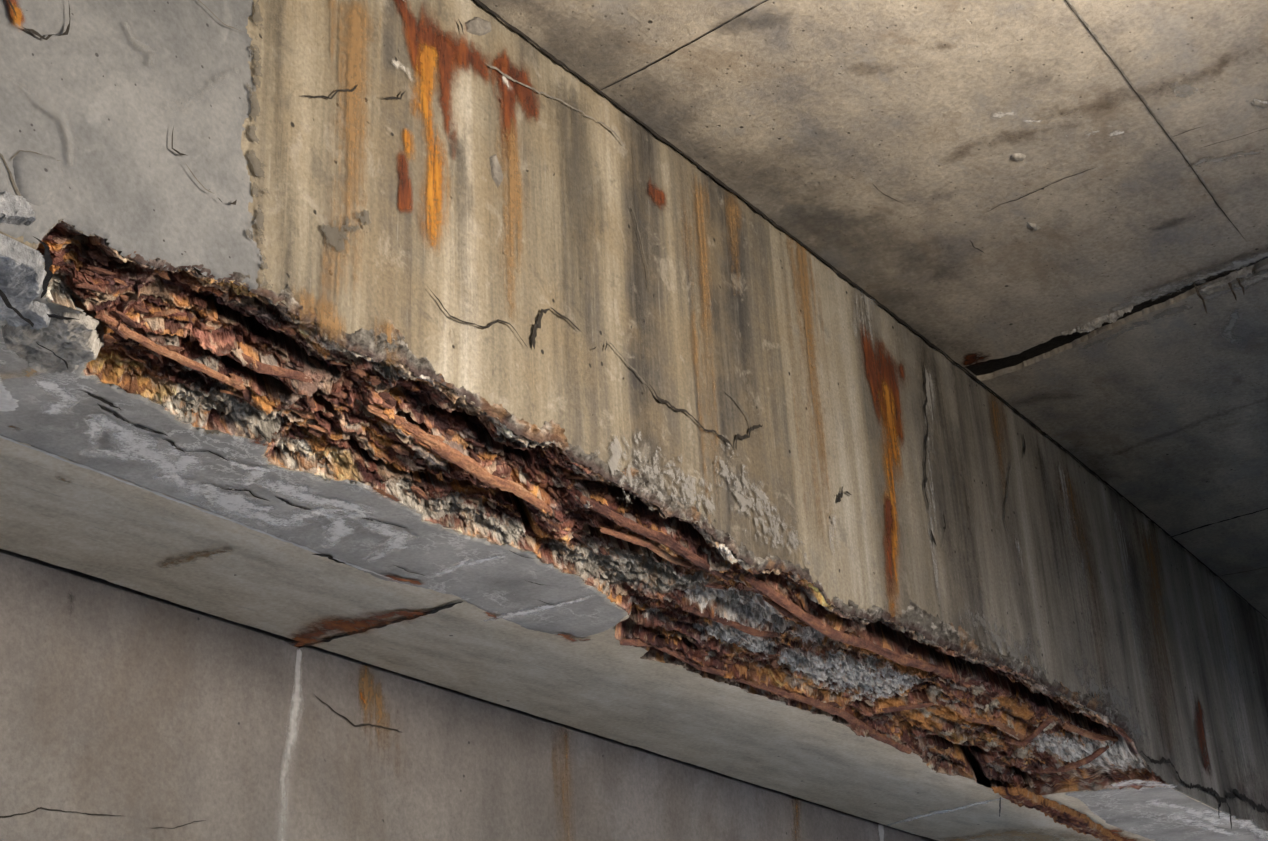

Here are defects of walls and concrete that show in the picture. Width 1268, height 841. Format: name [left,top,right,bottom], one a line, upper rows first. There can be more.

corrosion [395,0,539,308]
spalling [489,154,504,188]
spalling [1198,265,1268,295]
leakage [35,380,78,414]
leakage [84,415,413,562]
crack [428,287,763,450]
spalling [35,221,1172,841]
corrosion [861,328,905,610]
corrosion [292,611,424,647]
crack [0,807,121,818]
leakage [281,649,302,840]
crack [1142,751,1268,829]